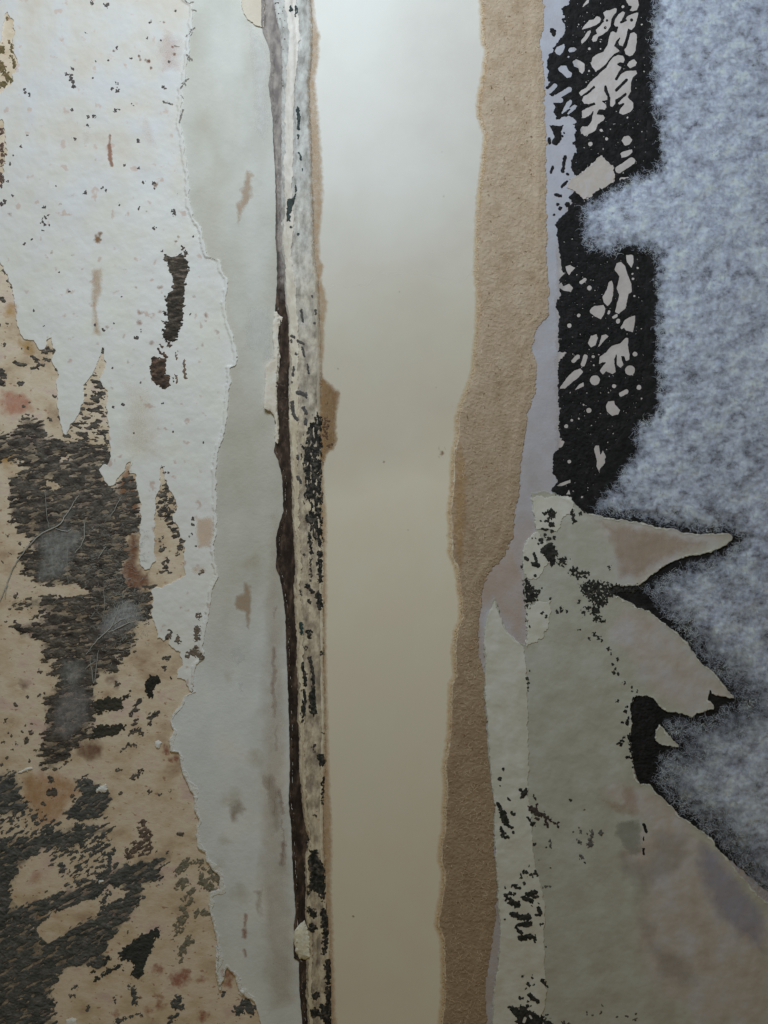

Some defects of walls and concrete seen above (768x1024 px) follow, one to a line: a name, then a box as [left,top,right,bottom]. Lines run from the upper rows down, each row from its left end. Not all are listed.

damp [0,345,57,387]
damp [0,372,220,1024]
peeling [0,0,238,692]
damp [276,319,480,1024]